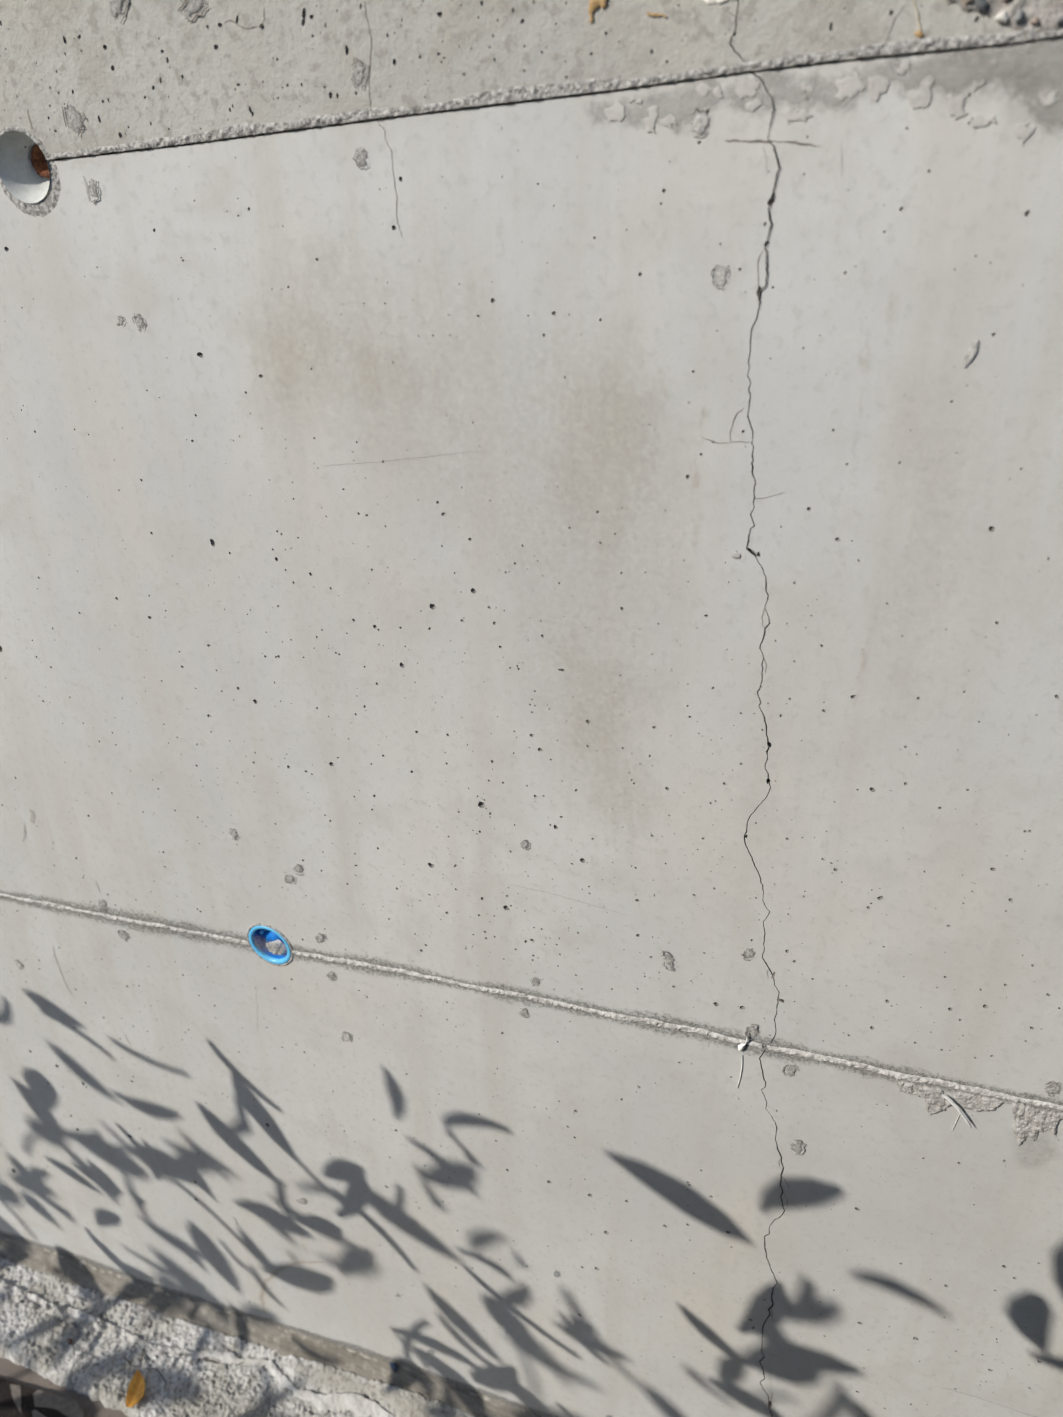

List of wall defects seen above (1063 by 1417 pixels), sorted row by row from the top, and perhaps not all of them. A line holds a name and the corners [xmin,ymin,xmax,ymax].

corrosion [31,145,50,179]
crack [702,0,821,1417]
peeling [896,1079,1063,1145]